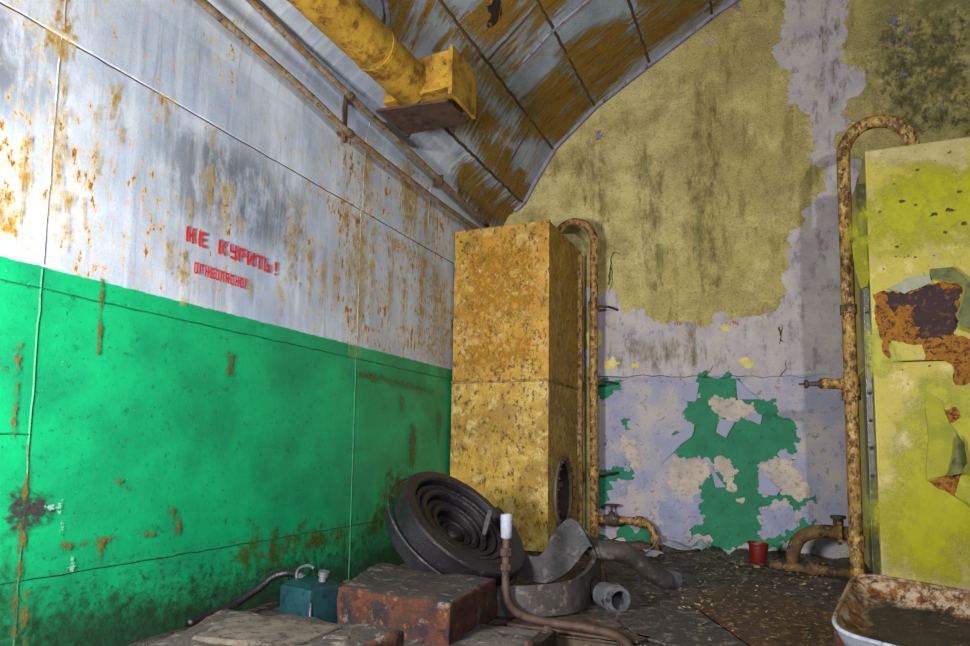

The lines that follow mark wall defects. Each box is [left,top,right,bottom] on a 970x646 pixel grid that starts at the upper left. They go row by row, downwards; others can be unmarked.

rust [44,0,78,62]
rust [383,0,722,227]
damp [875,20,969,132]
rust [0,162,32,238]
rust [49,78,85,250]
rust [167,242,187,284]
peeling [583,0,866,554]
rust [96,279,104,355]
rust [10,382,18,436]
rust [9,516,31,646]
rust [61,537,111,559]
peeling [801,538,849,559]